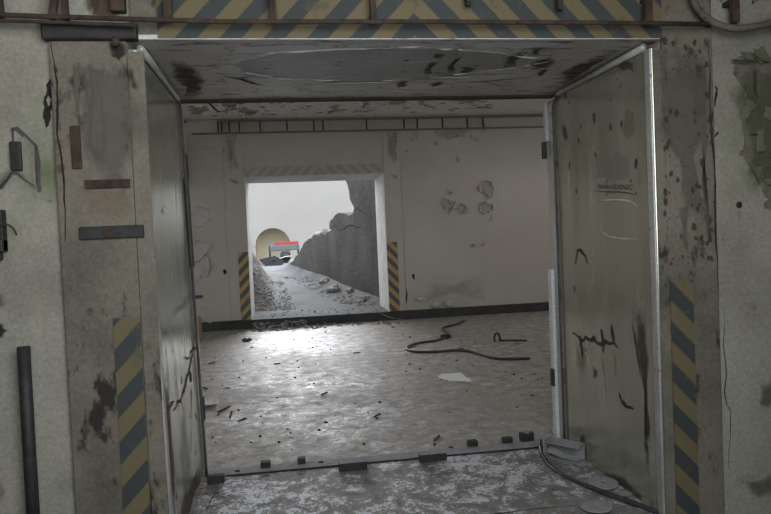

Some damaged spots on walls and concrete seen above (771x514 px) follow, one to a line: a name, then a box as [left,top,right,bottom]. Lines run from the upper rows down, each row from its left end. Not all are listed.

peeling [733,45,771,210]
peeling [190,205,214,280]